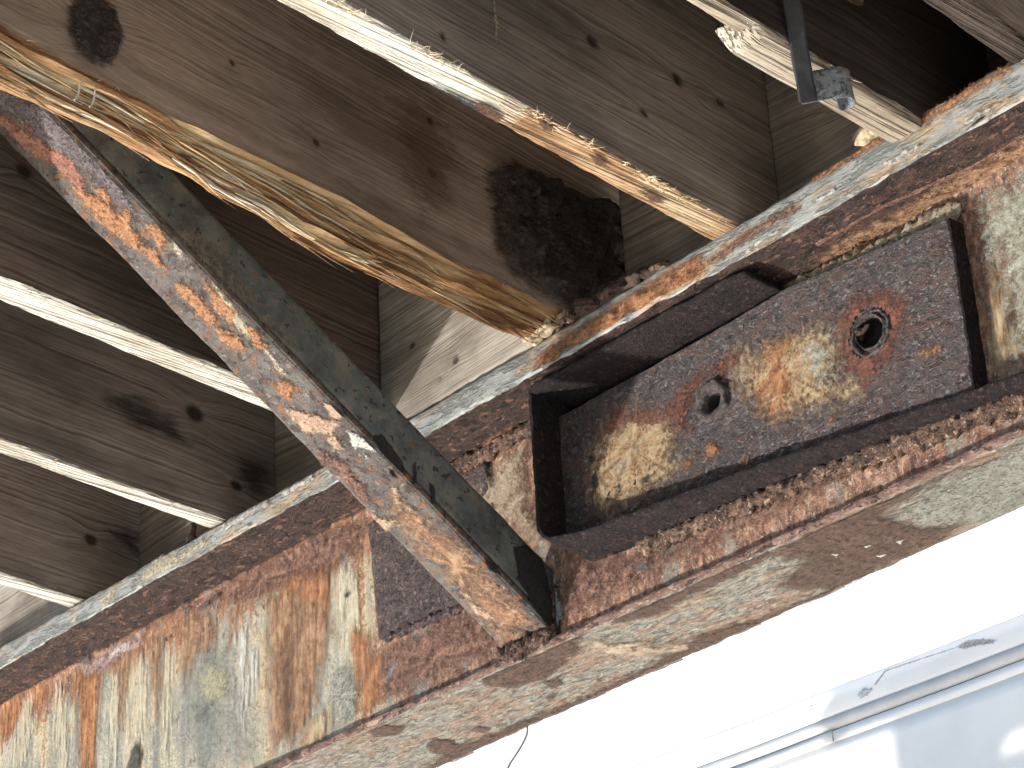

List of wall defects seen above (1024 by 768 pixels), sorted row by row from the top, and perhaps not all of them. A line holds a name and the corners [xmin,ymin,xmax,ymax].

corrosion [709,203,800,265]
corrosion [663,288,904,432]
corrosion [316,449,370,502]
peeling [589,408,681,510]
corrosion [703,442,719,461]
corrosion [144,521,368,751]
corrosion [351,500,530,715]
corrosion [425,458,984,768]
corrosion [0,683,51,743]
corrosion [73,671,101,768]
corrosion [113,649,129,723]
corrosion [368,725,404,737]